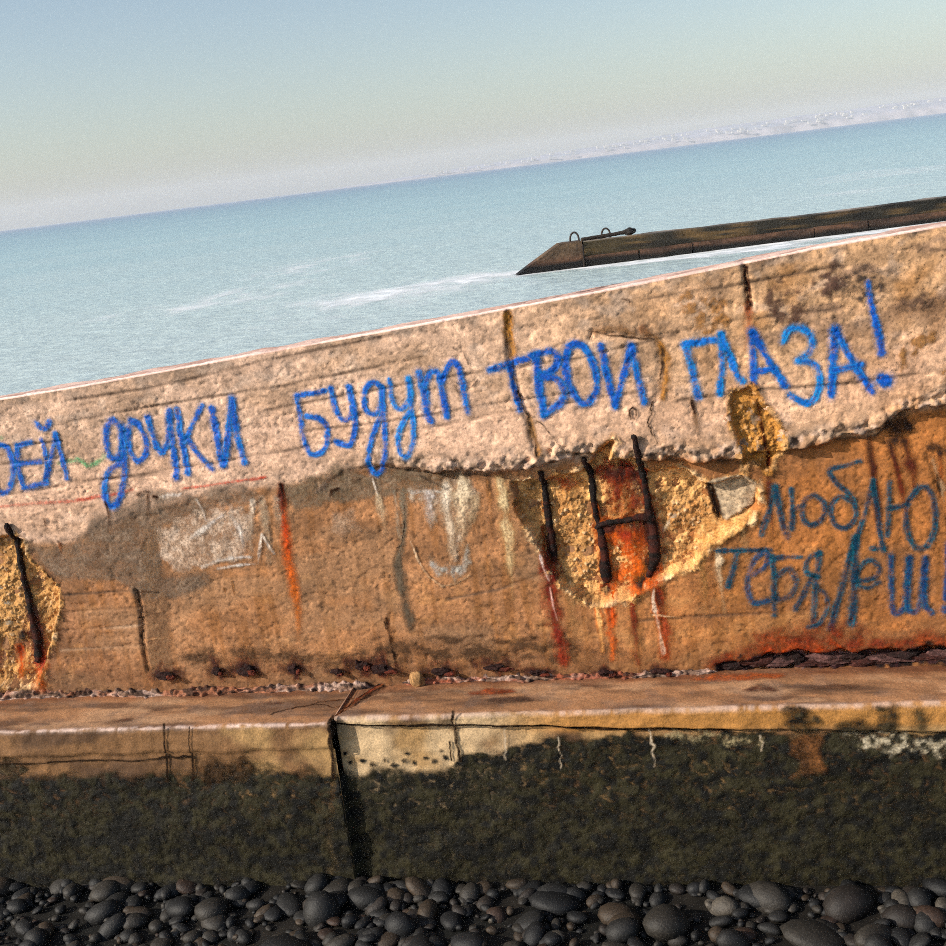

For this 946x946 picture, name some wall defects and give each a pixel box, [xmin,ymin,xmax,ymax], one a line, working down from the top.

crack [503,310,563,457]
peeling [589,325,671,436]
corrosion [15,609,46,674]
spalling [0,523,63,692]
water stain [38,466,514,629]
corrosion [277,483,300,621]
crack [270,617,728,780]
corrosion [592,461,674,677]
spalling [509,382,789,608]
corrosion [697,627,946,691]
corrosion [926,444,946,476]